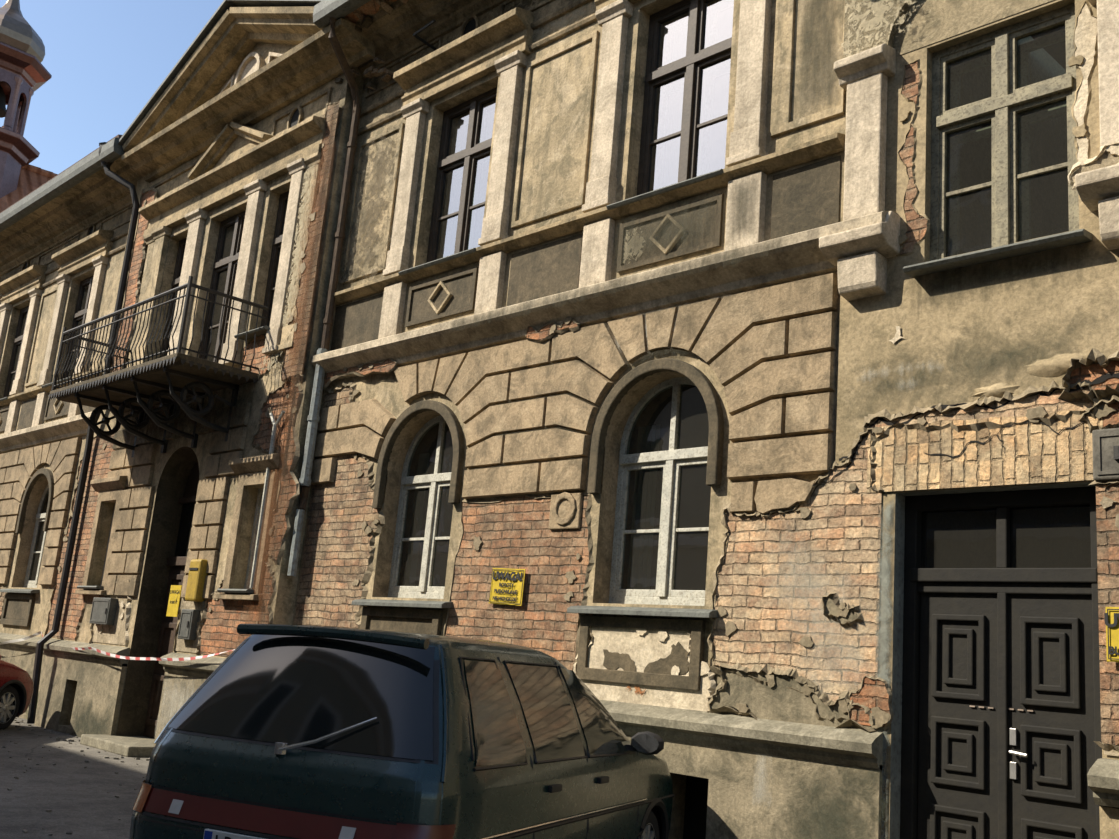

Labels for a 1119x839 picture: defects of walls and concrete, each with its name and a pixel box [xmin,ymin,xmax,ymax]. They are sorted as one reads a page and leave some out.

peeling [340,114,403,287]
flaking render [898,59,930,256]
flaking render [1068,0,1098,162]
peeling [1106,141,1119,164]
flaking render [173,99,385,656]
flaking render [323,358,397,408]
crack [807,373,1119,506]
flaking render [443,348,1119,756]